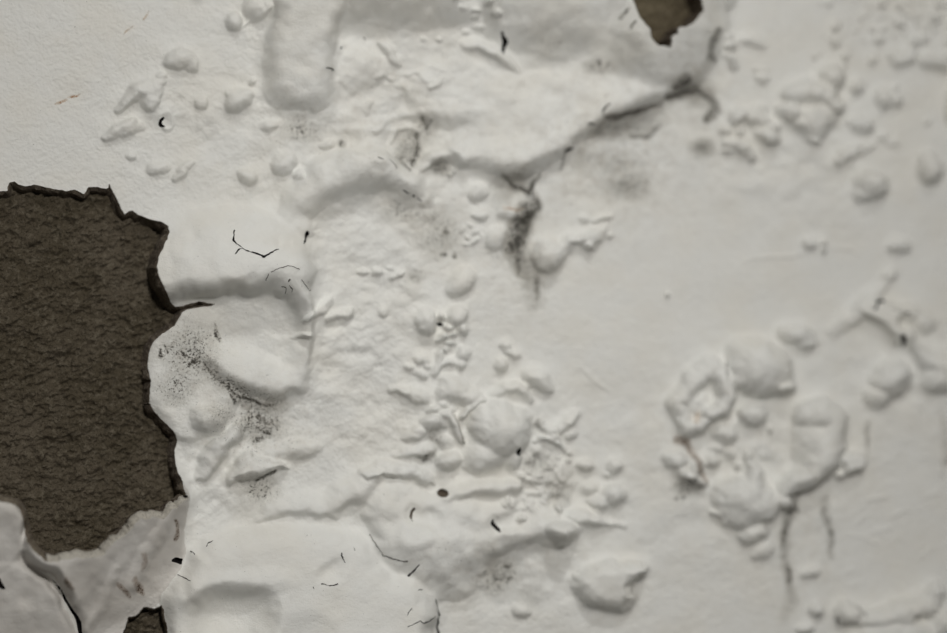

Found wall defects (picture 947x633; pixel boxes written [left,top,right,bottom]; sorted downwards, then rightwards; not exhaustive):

spalling [633,0,704,48]
leakage [494,172,541,293]
spalling [0,181,243,633]
leakage [159,317,282,443]